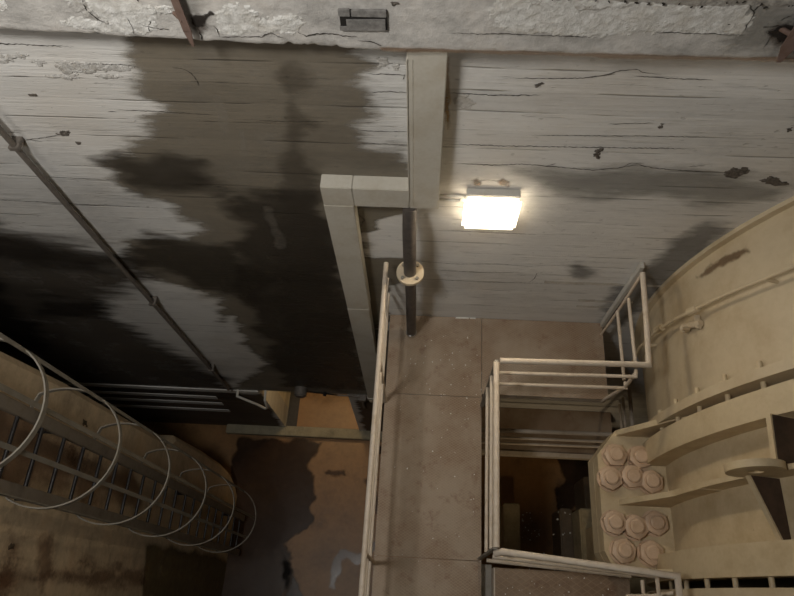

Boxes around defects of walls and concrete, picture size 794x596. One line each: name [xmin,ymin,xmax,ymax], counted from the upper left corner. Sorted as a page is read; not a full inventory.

peeling [60,0,172,36]
peeling [488,0,768,38]
spalling [764,5,794,47]
spalling [724,167,750,179]
spalling [759,176,789,186]
water stain [0,36,408,431]